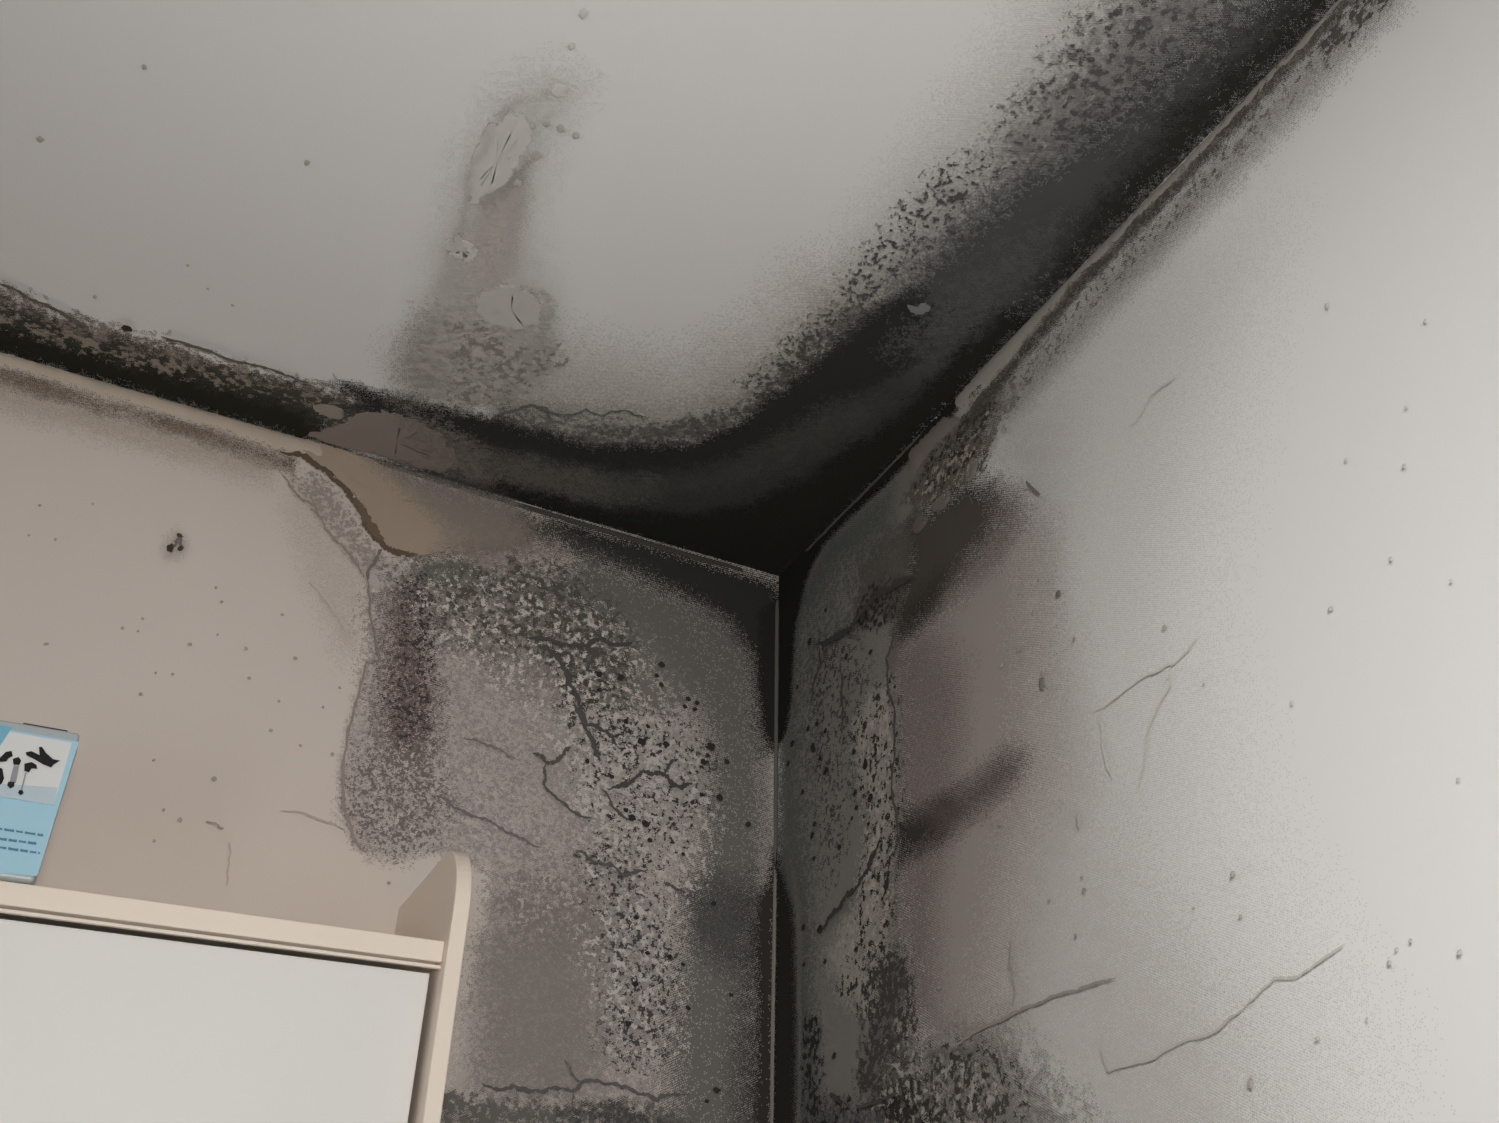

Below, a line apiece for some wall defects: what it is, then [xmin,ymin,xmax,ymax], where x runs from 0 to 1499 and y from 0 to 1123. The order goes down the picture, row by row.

peeling [468,110,533,205]
peeling [475,283,543,331]
peeling [300,404,478,556]
crack [437,635,693,893]
crack [812,576,913,930]
crack [947,940,1116,1069]
crack [1245,943,1346,1005]
crack [482,1060,690,1119]